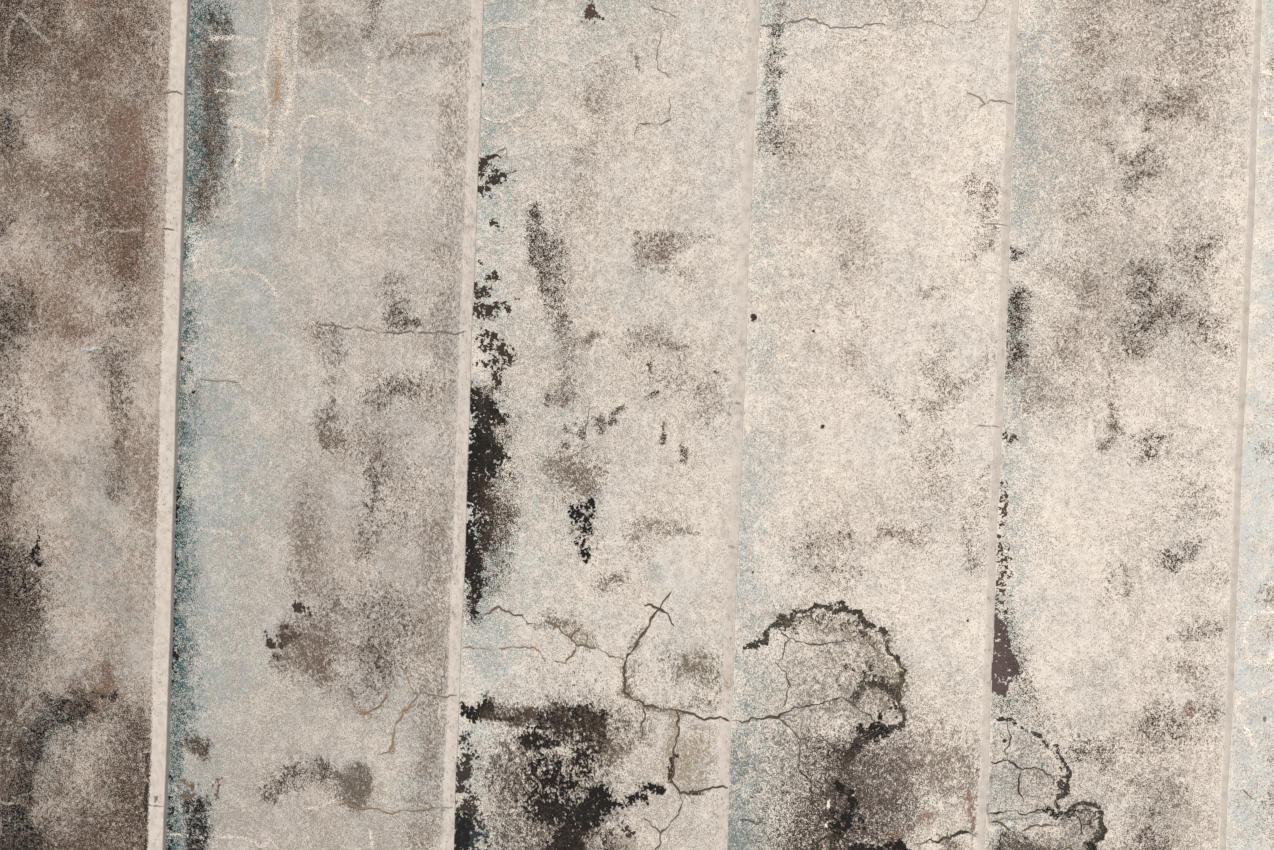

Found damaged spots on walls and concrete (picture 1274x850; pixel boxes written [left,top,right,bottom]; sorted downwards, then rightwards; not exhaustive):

mould [478,154,519,199]
damp [520,201,610,412]
damp [463,259,529,629]
damp [0,524,69,662]
damp [568,492,597,564]
damp [0,687,119,850]
damp [143,753,151,850]
damp [454,626,723,850]
crack [350,592,877,850]
spalling [813,717,942,850]
crack [916,721,1095,850]